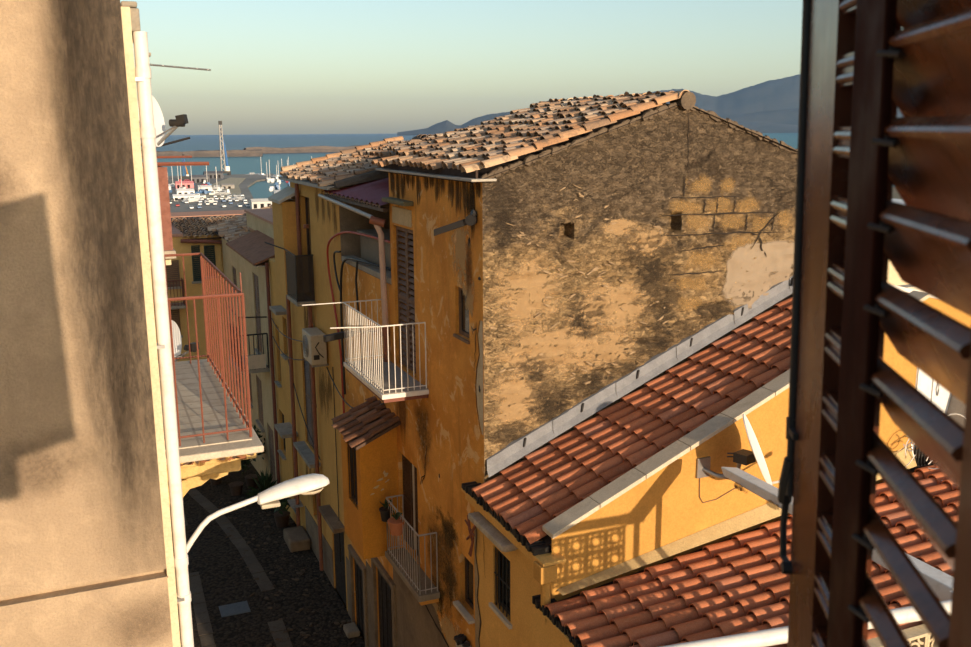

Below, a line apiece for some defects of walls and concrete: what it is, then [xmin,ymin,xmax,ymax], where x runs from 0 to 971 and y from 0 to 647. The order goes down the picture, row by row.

damp [58,0,158,480]
damp [390,173,514,251]
spalling [602,177,794,310]
spalling [451,220,669,436]
damp [397,401,428,450]
damp [428,511,461,616]